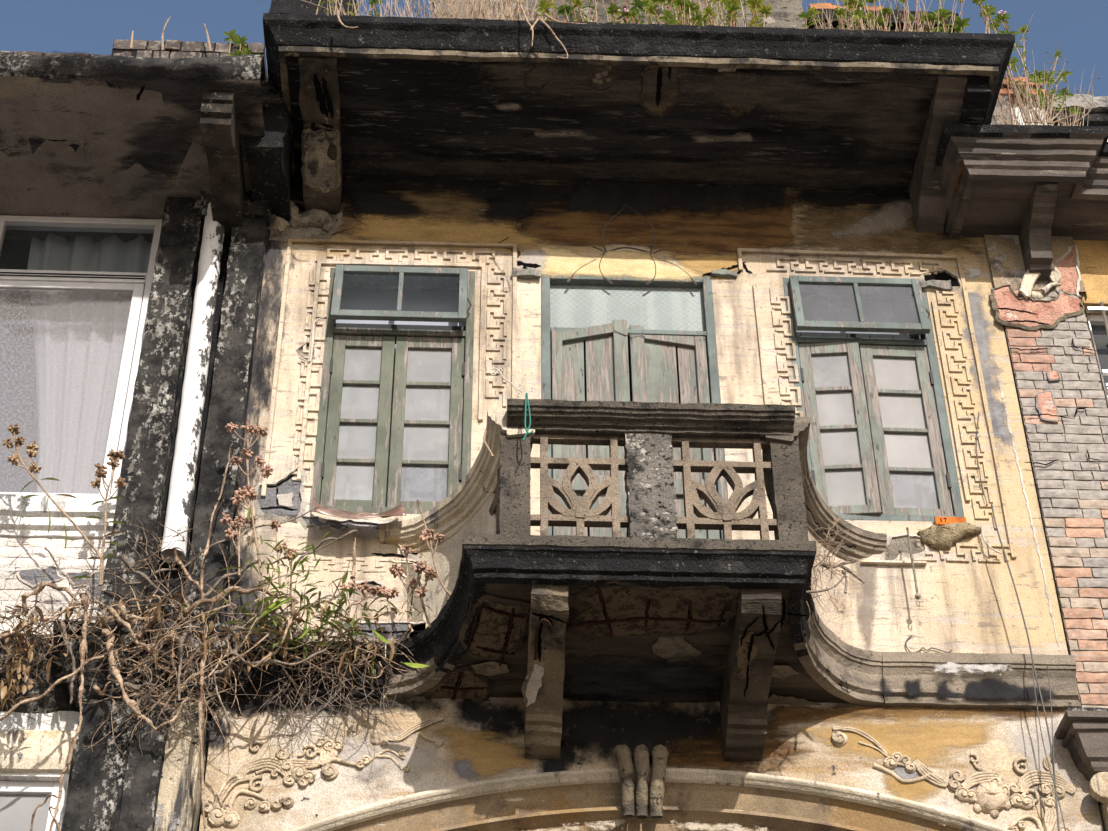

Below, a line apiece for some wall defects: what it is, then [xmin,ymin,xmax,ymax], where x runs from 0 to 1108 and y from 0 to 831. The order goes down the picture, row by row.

damp [335,55,982,260]
flaking render [990,246,1085,330]
spalling [253,467,389,539]
crack [805,505,856,551]
spalling [342,543,428,644]
crack [531,612,568,662]
crack [741,598,809,698]
damp [540,741,576,773]
damp [667,677,1064,771]